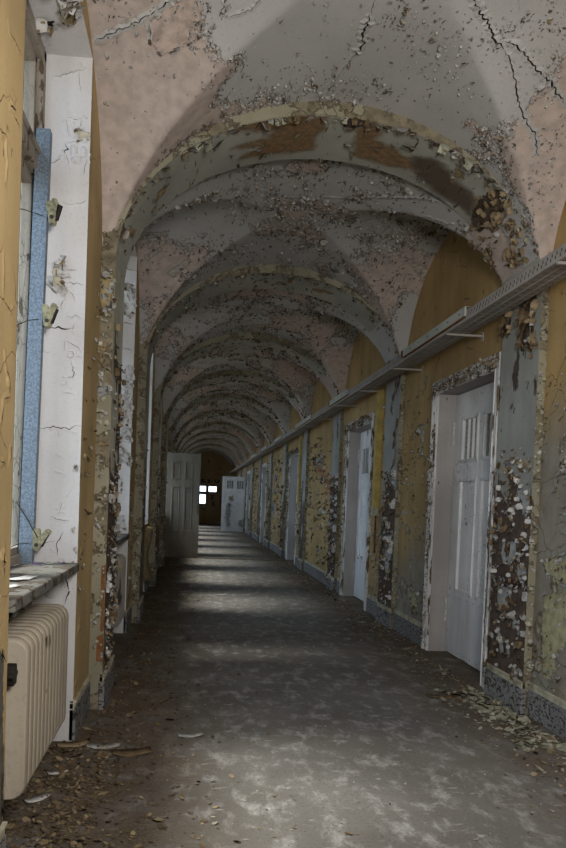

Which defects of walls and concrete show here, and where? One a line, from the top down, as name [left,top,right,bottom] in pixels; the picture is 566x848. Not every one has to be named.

crack [93,0,176,44]
crack [225,0,263,20]
crack [324,0,378,98]
crack [467,0,566,158]
crack [51,110,92,207]
peeling [35,0,566,696]
peeling [9,575,38,588]